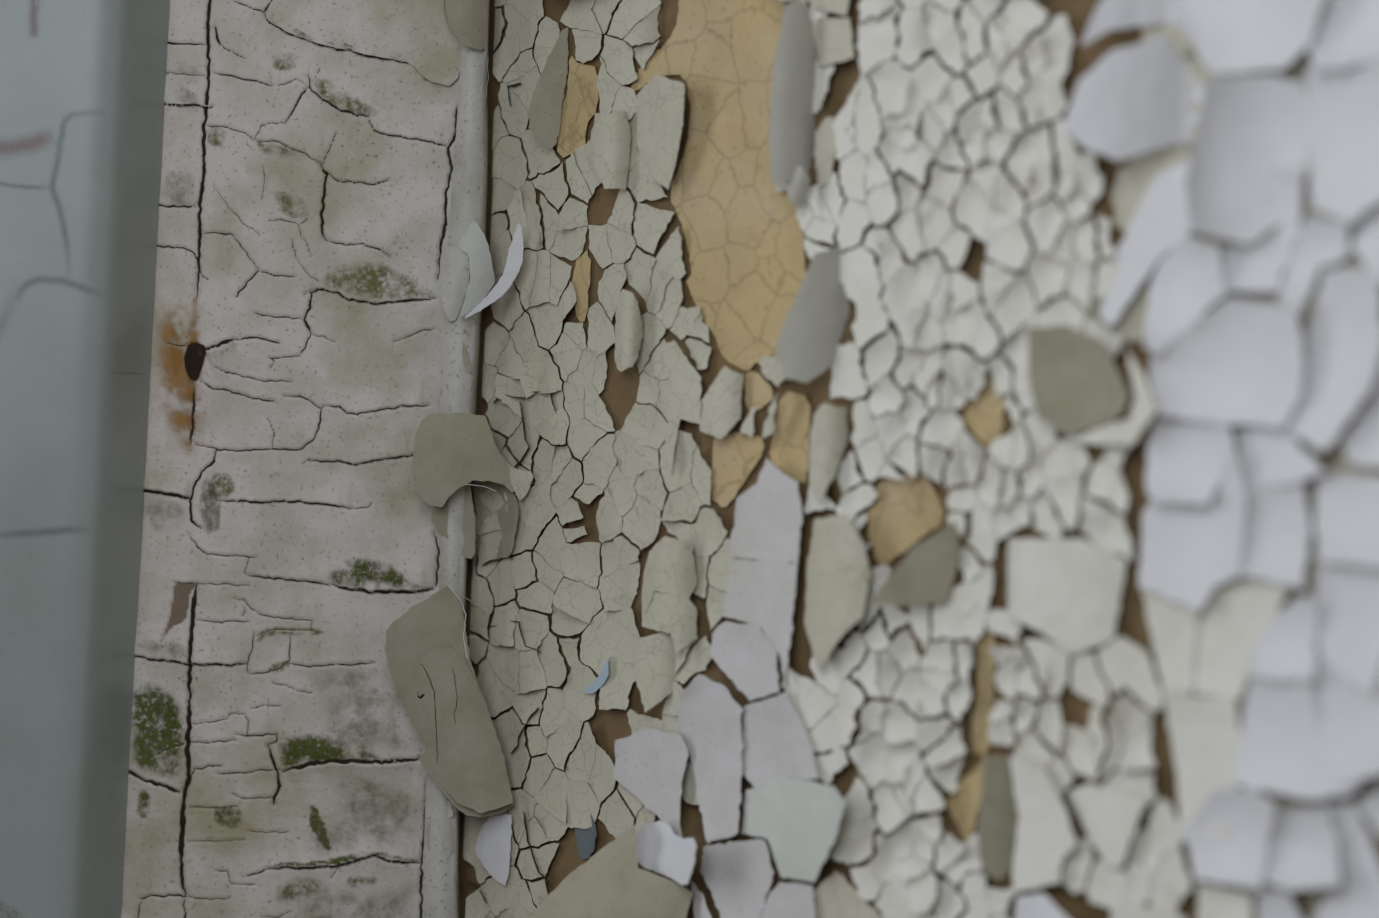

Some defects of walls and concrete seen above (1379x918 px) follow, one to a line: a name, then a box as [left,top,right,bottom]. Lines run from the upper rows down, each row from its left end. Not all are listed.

rust [162,321,203,428]
crack [128,0,742,918]
peeling [532,0,959,918]
crack [740,354,785,438]
peeling [957,373,1005,447]
peeling [1007,0,1379,918]
peeling [476,814,512,885]
peeling [945,626,1147,918]